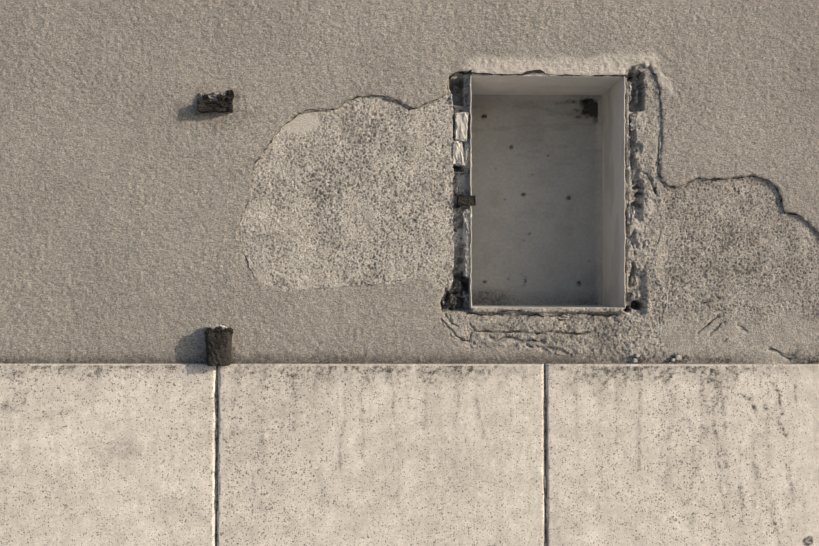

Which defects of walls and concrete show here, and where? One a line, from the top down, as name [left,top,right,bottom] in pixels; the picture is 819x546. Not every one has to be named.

flaking render [239,89,454,292]
flaking render [644,66,819,364]